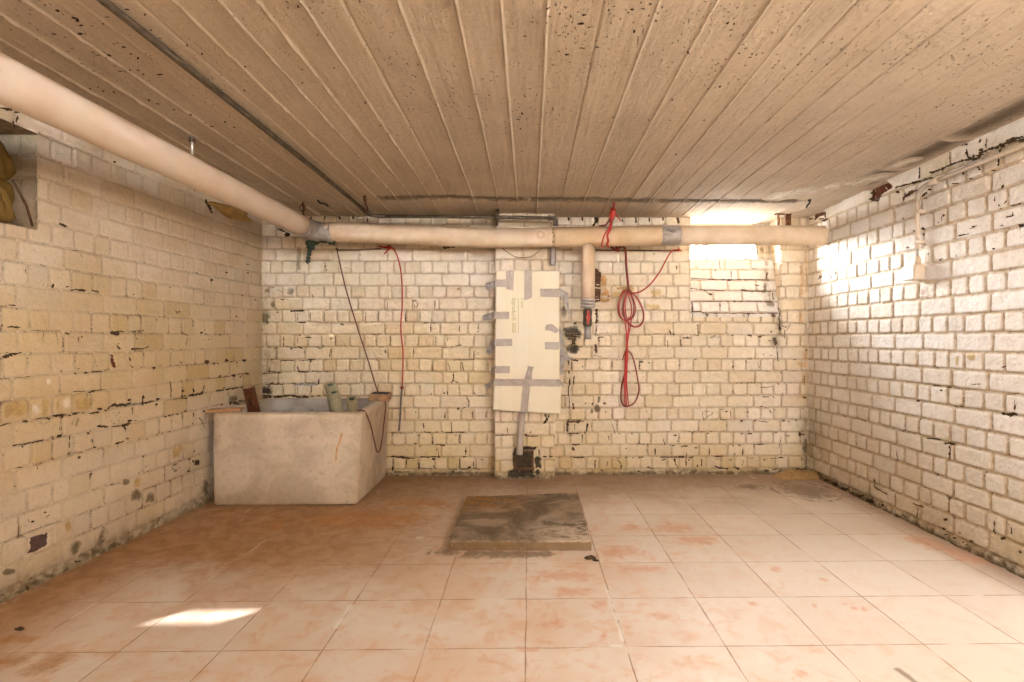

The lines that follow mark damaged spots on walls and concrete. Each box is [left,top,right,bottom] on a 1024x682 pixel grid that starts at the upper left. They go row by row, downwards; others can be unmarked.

damp [109,475,159,505]
damp [169,440,213,501]
damp [505,445,602,479]
damp [799,435,1024,578]
flaking render [28,533,48,560]
damp [0,518,123,599]